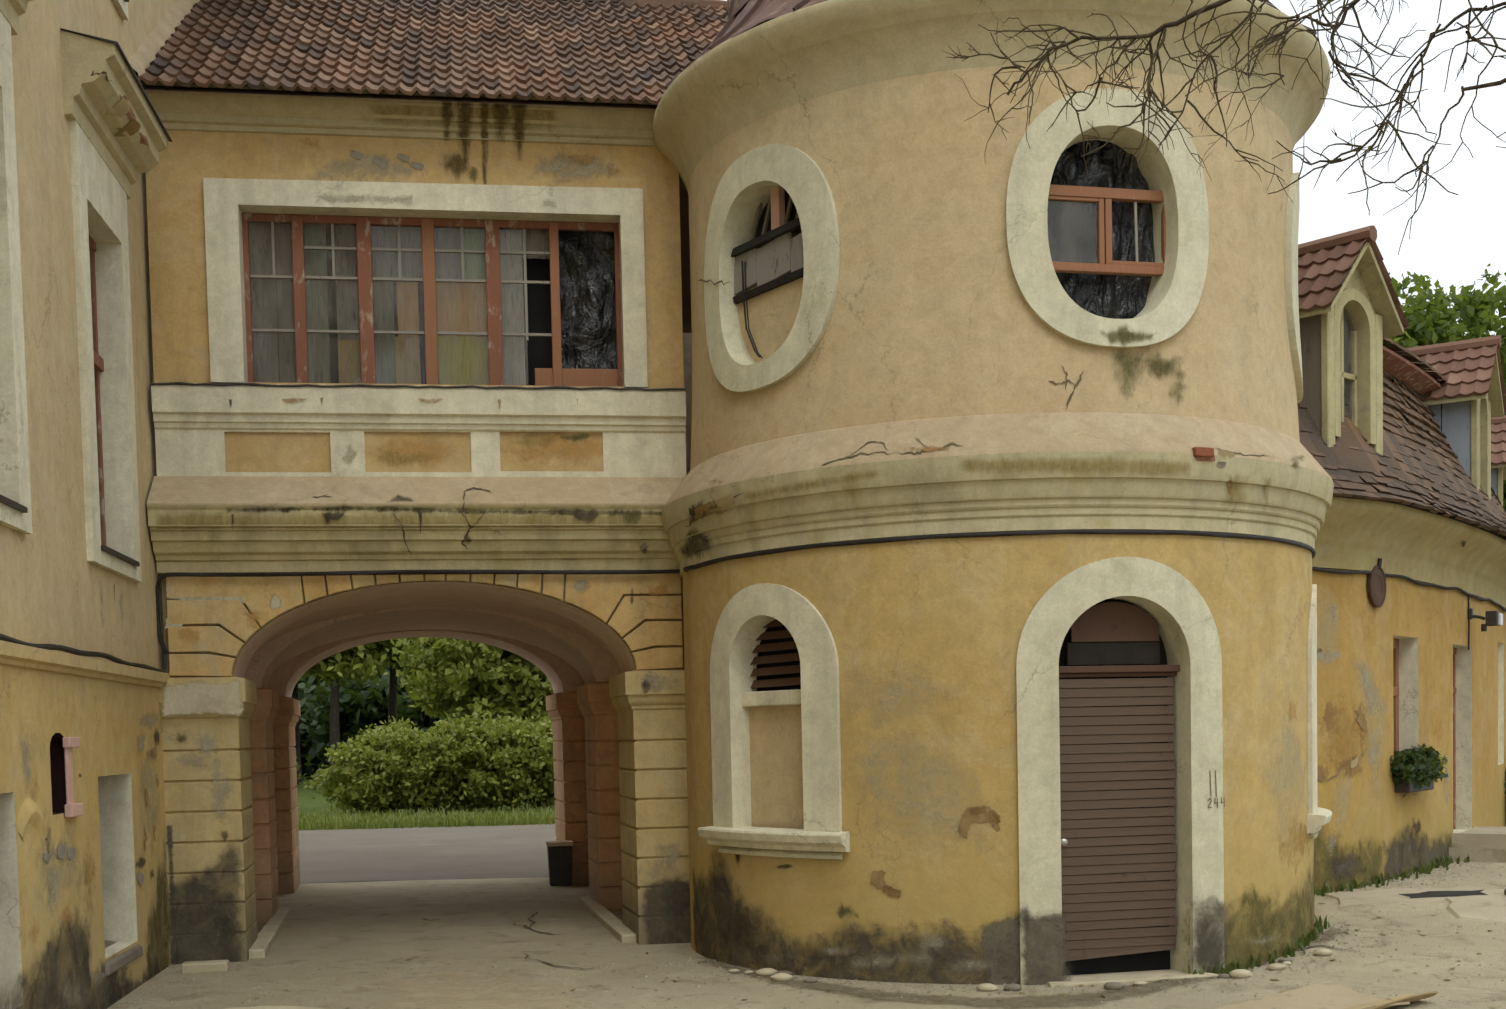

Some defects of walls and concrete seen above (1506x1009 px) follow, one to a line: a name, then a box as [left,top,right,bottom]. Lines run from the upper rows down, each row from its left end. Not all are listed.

leakage [380,101,553,185]
leakage [1108,326,1182,398]
crack [822,437,963,466]
crack [461,487,490,550]
peeling [1317,667,1383,782]
spalling [958,806,1001,838]
leakage [0,826,241,1009]
leakage [644,846,1070,985]
leakage [1185,820,1451,973]